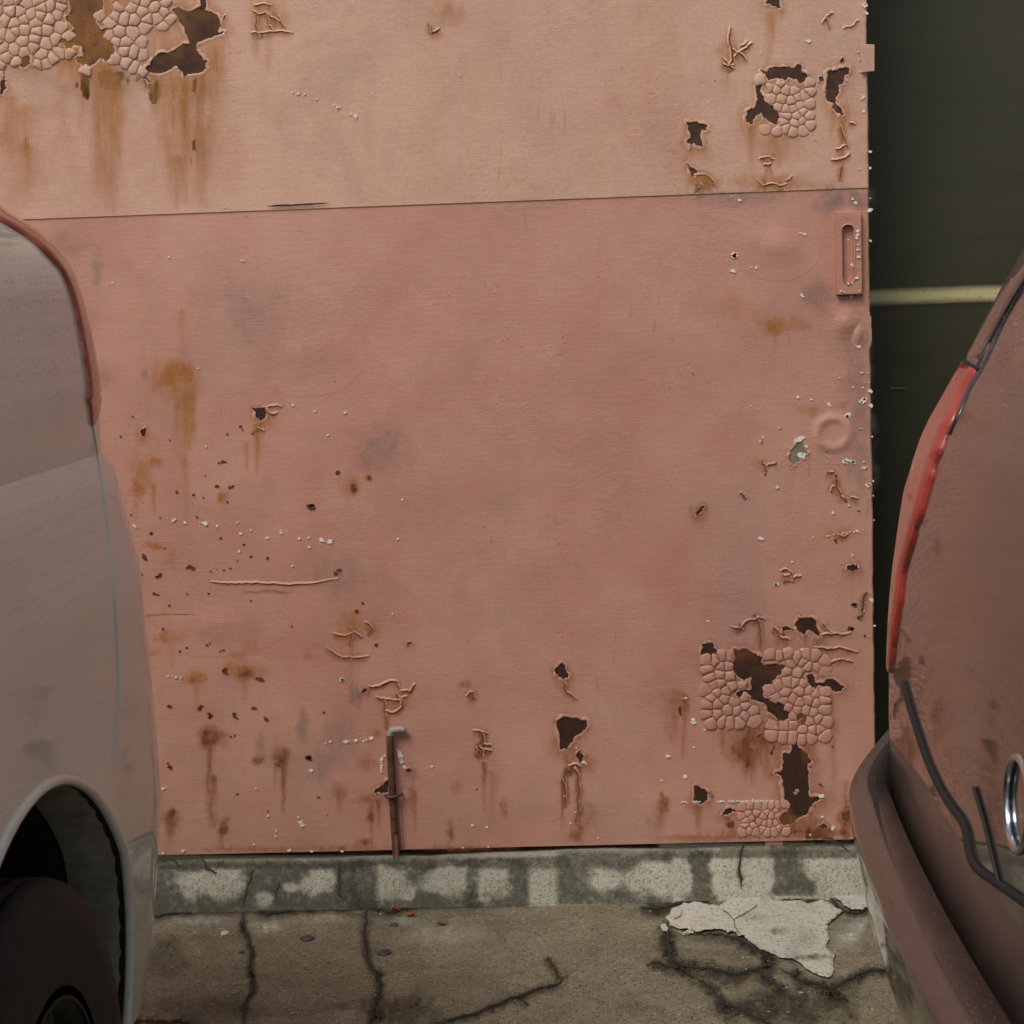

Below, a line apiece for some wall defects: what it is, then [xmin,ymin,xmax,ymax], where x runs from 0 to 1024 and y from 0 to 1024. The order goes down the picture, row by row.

peeling [0,0,228,128]
peeling [742,51,862,143]
peeling [682,118,711,180]
peeling [785,436,811,469]
peeling [553,660,572,683]
rust [197,705,235,783]
peeling [554,713,592,764]
peeling [683,614,851,837]
crack [154,910,195,918]
crack [239,863,415,1024]
crack [640,841,886,1024]
crack [430,955,566,1024]